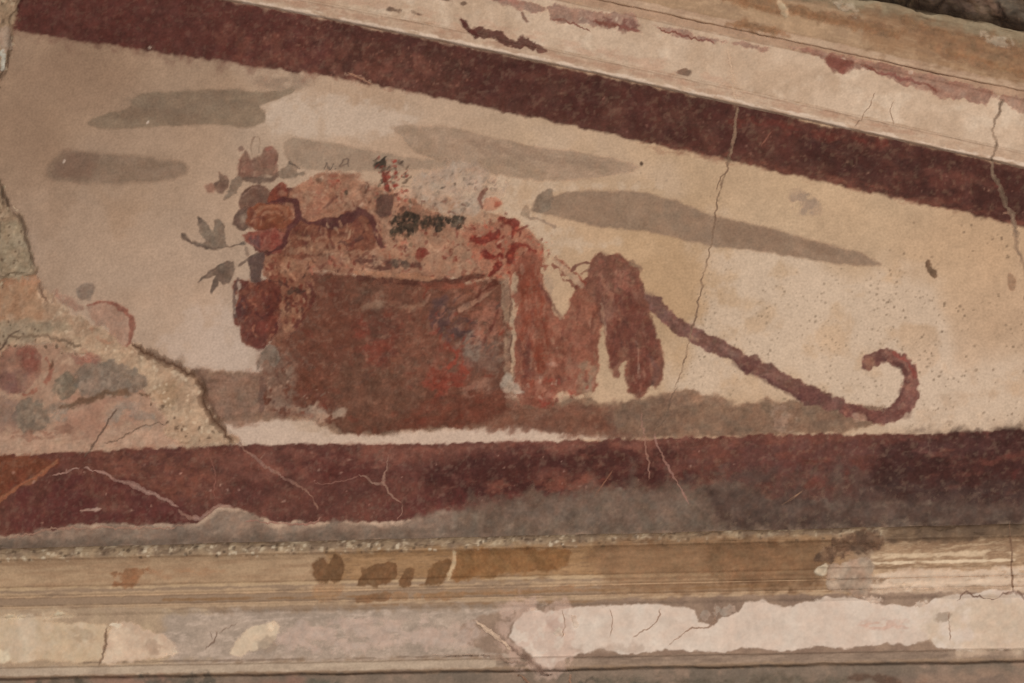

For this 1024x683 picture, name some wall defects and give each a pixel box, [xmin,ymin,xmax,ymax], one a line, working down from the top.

crack [991,100,1022,260]
crack [646,107,738,498]
peeling [0,612,177,664]
damp [356,562,414,603]
damp [0,481,1024,591]
peeling [510,590,1024,670]